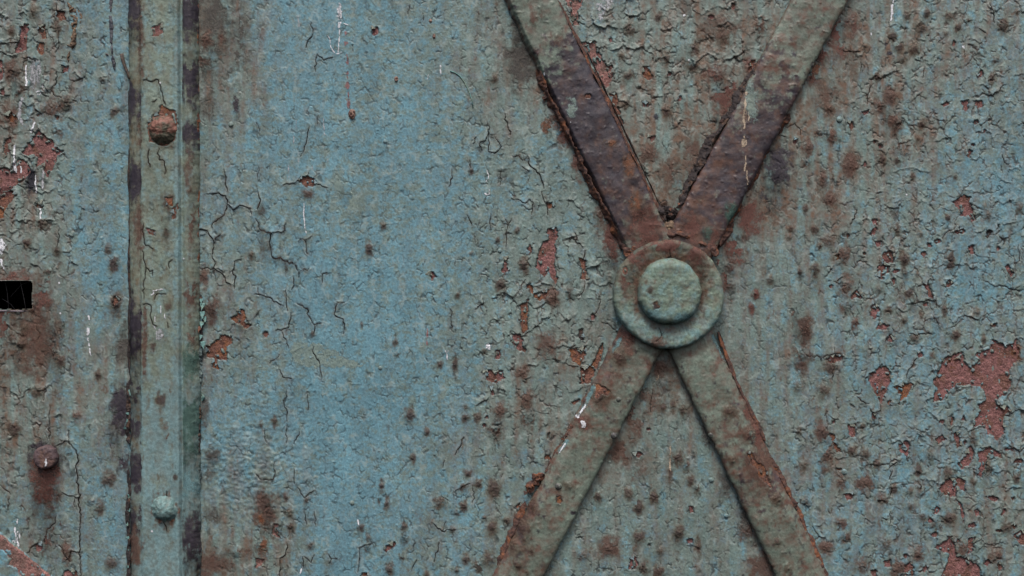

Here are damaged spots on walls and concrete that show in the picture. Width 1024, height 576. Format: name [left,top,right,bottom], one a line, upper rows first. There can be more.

peeling [0,131,63,218]
crack [450,114,548,243]
rust [536,0,837,315]
rust [102,0,293,576]
peeling [198,294,251,370]
crack [200,170,345,524]
peeling [510,227,558,352]
peeling [569,314,610,408]
rust [22,440,71,566]
crack [279,543,372,576]
rust [718,332,850,576]
peeling [928,339,1024,576]